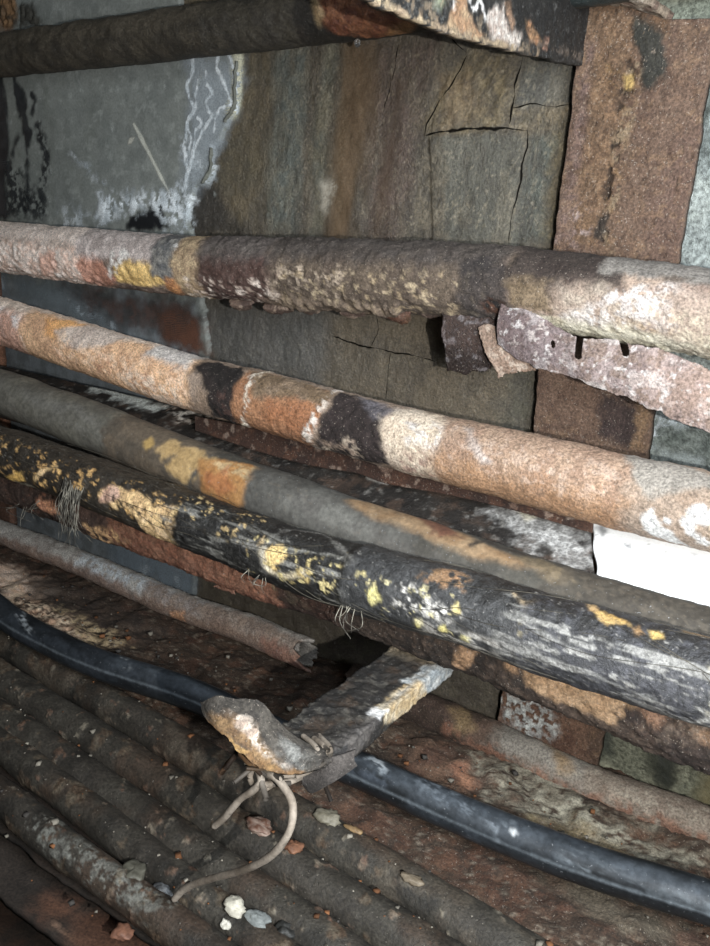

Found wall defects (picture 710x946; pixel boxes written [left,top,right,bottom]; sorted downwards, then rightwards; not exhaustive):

damp [95,54,243,231]
crack [424,39,569,241]
crack [333,316,435,394]